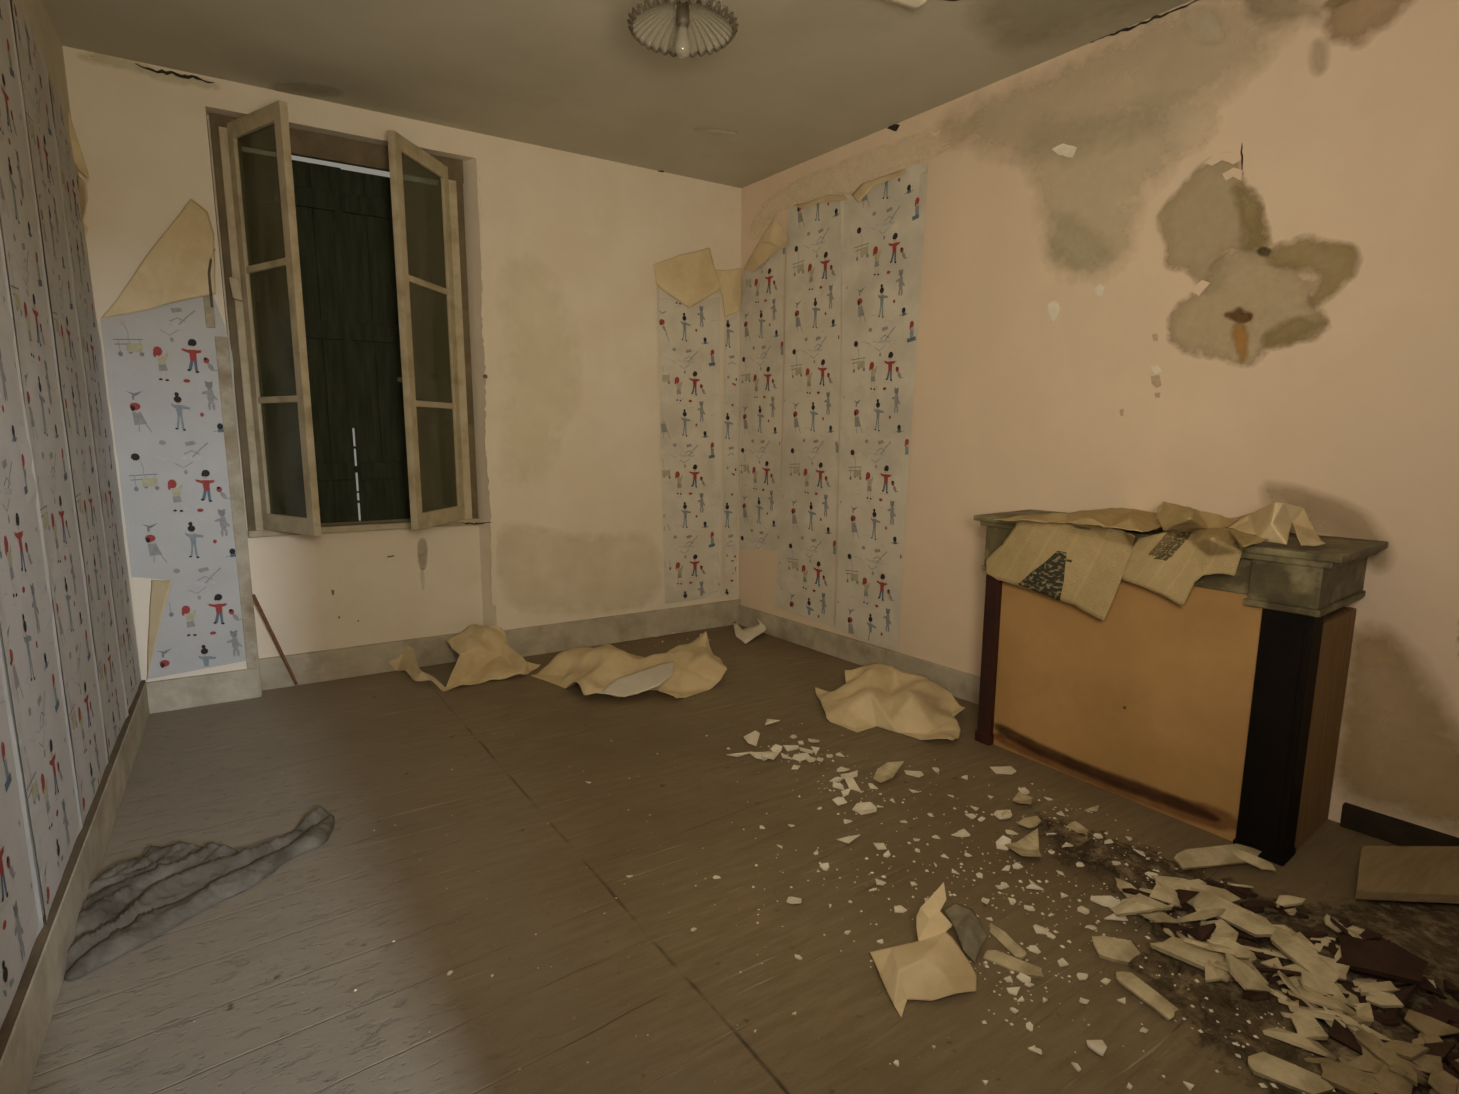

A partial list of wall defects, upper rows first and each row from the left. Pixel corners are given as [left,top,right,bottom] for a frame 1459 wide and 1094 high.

flaking render [885,0,927,10]
damp [1326,0,1404,41]
damp [1159,153,1357,365]